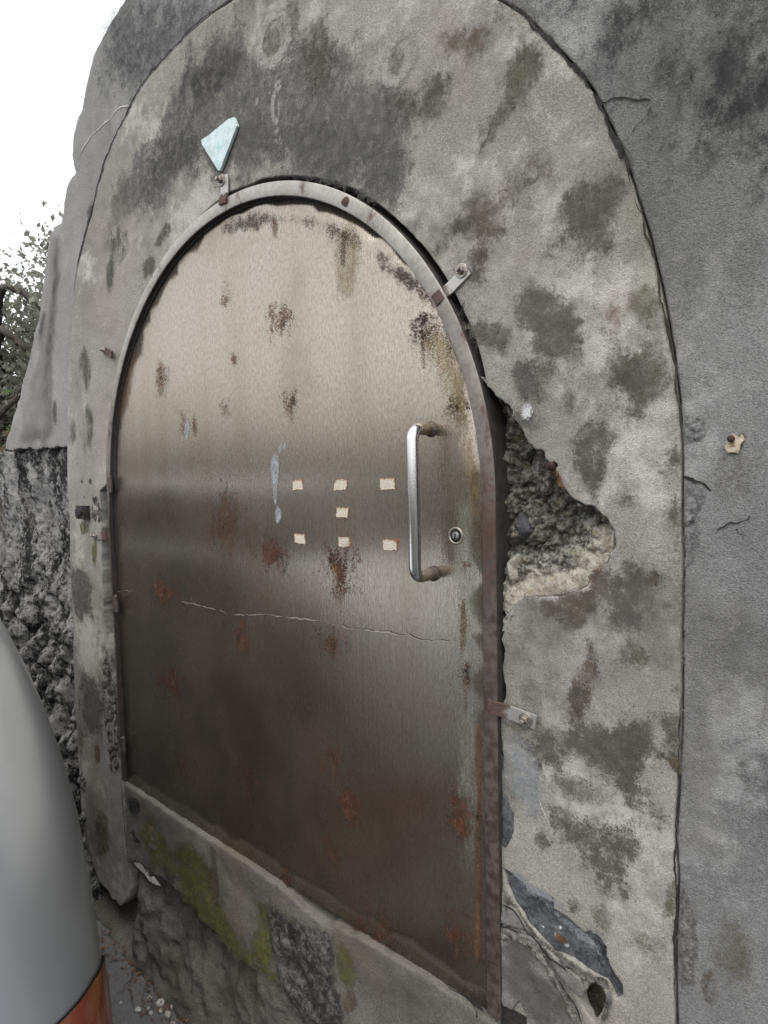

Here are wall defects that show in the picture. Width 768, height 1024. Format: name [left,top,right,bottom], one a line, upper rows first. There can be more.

leakage [101,0,451,288]
leakage [544,161,626,257]
crack [501,0,699,437]
rust [265,302,294,340]
rust [314,541,363,597]
spalling [492,390,616,631]
crack [717,516,750,535]
rust [442,726,482,963]
spalling [498,870,623,1024]